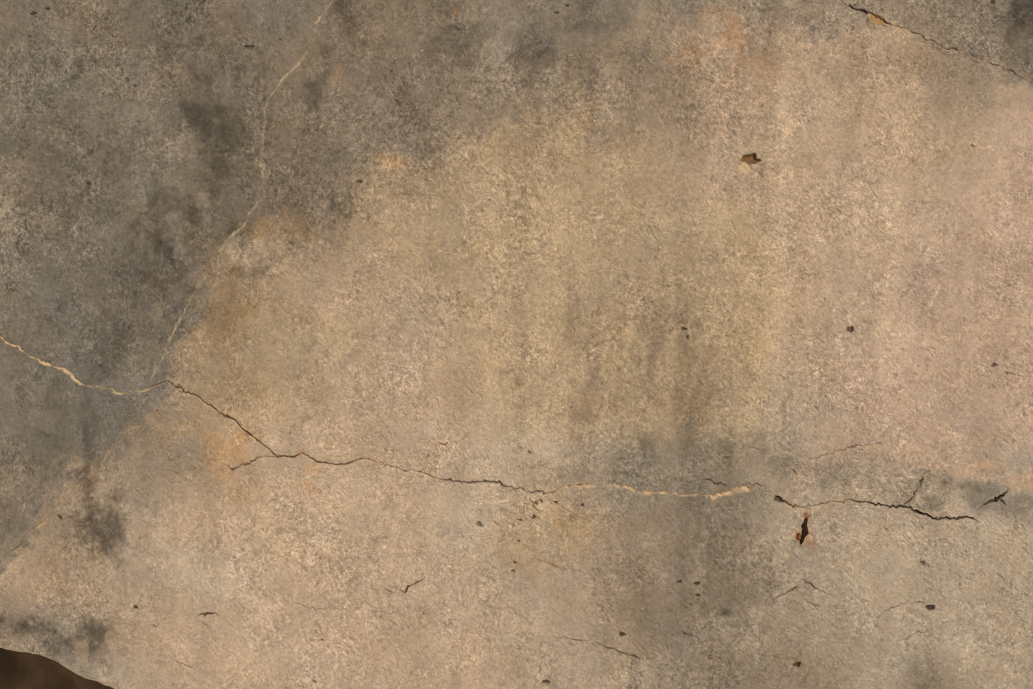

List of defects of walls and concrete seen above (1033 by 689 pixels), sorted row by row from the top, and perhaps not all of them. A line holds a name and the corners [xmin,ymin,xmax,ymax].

crack [0,0,1033,523]
corrosion [789,507,820,558]